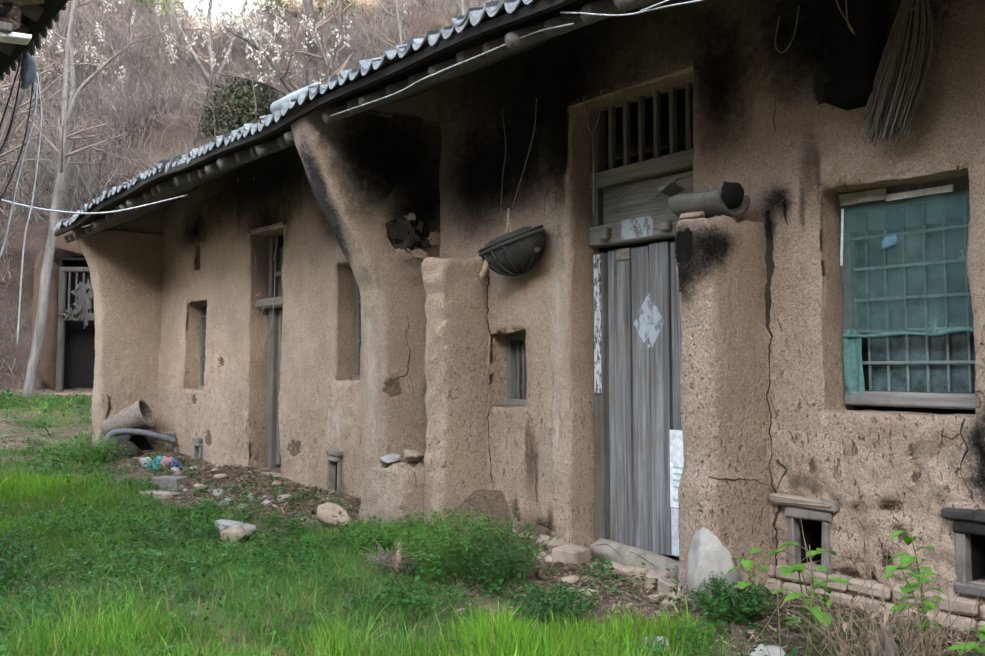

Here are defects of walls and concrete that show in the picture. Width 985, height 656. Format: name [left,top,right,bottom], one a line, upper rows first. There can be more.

water stain [675,231,692,294]
water stain [695,234,731,267]
spalling [379,371,402,397]
crack [709,199,788,566]
crack [940,418,969,492]